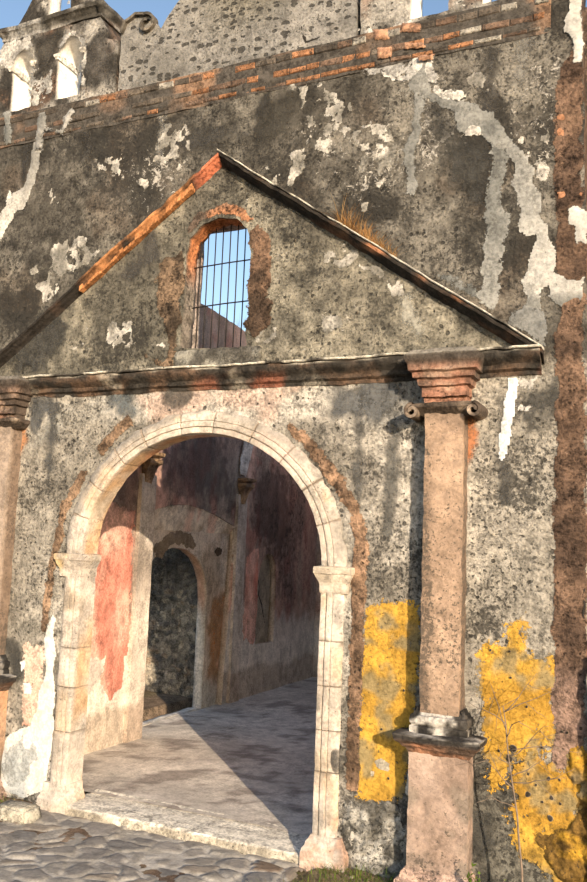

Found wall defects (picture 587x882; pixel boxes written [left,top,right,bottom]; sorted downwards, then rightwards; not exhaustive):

leakage [0,141,43,239]
leakage [402,48,585,346]
peeling [518,34,587,281]
flaking render [187,202,276,344]
leakage [9,317,68,372]
peeling [532,293,587,882]
leakage [472,810,495,860]